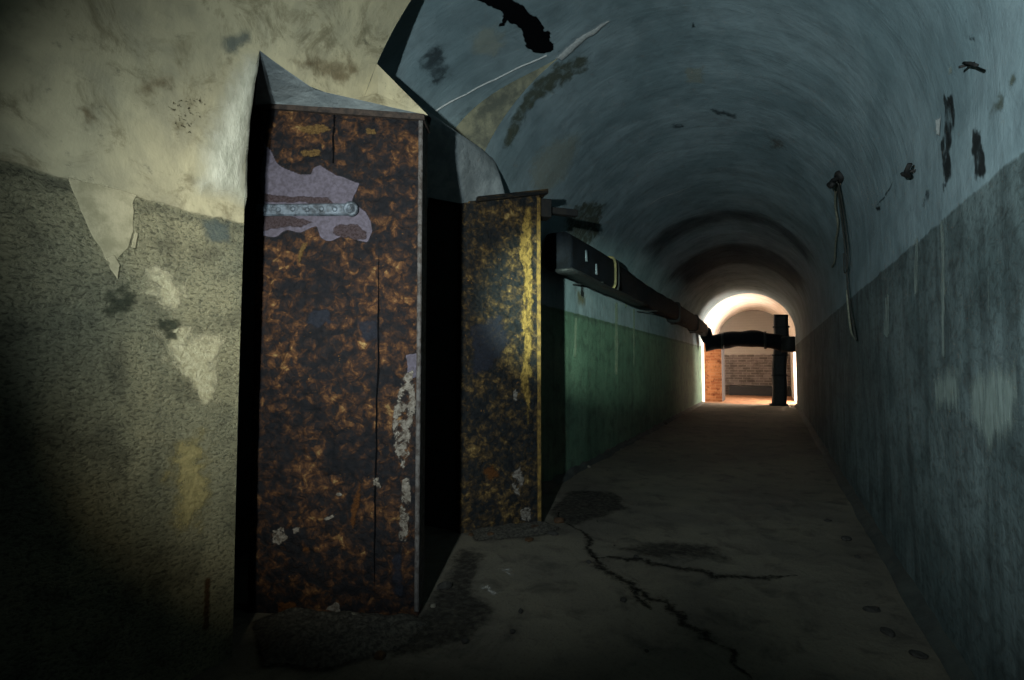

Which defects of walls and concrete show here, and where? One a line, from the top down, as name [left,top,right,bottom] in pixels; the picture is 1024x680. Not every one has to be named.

rust [300,124,331,134]
damp [504,57,587,146]
damp [941,95,954,188]
damp [971,130,985,178]
peeling [69,178,138,278]
peeling [145,266,187,309]
peeling [164,325,225,404]
peeling [392,370,416,541]
crack [558,512,798,679]